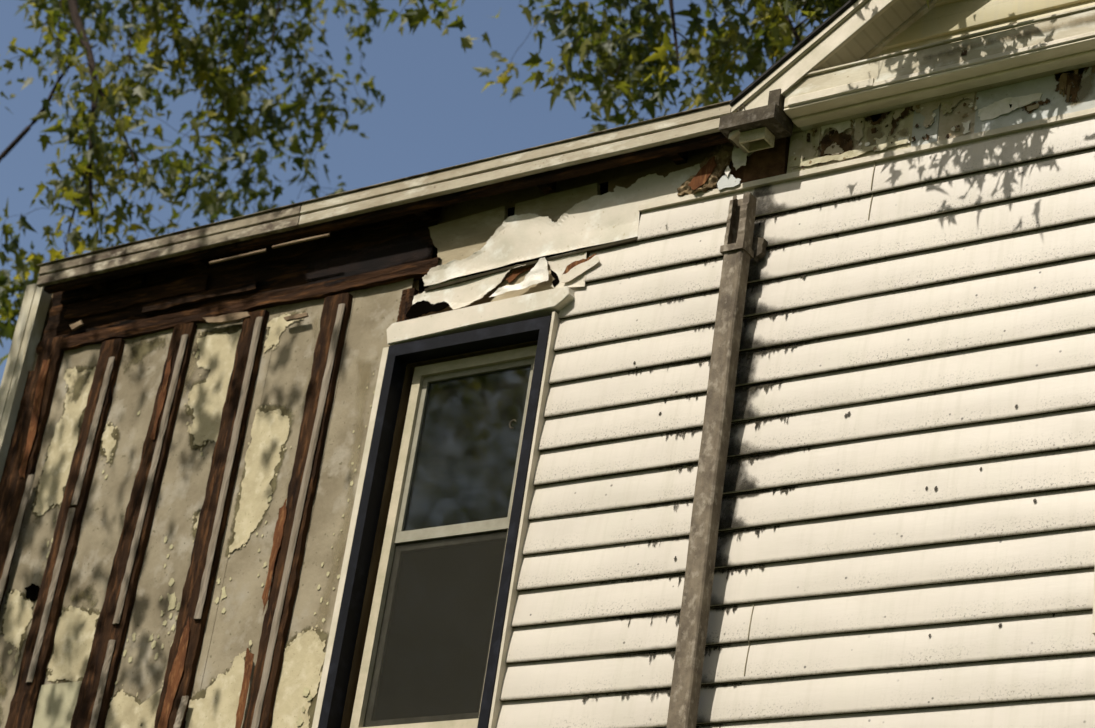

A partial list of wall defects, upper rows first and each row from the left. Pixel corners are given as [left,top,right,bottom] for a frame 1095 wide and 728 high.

peeling [688,156,741,190]
peeling [789,92,1043,169]
peeling [184,325,242,456]
damp [714,185,861,579]
peeling [31,365,97,522]
peeling [225,403,293,567]
peeling [0,589,34,675]
peeling [46,606,100,683]
peeling [105,681,163,728]
peeling [185,640,252,728]
peeling [271,562,340,728]
damp [710,599,738,615]